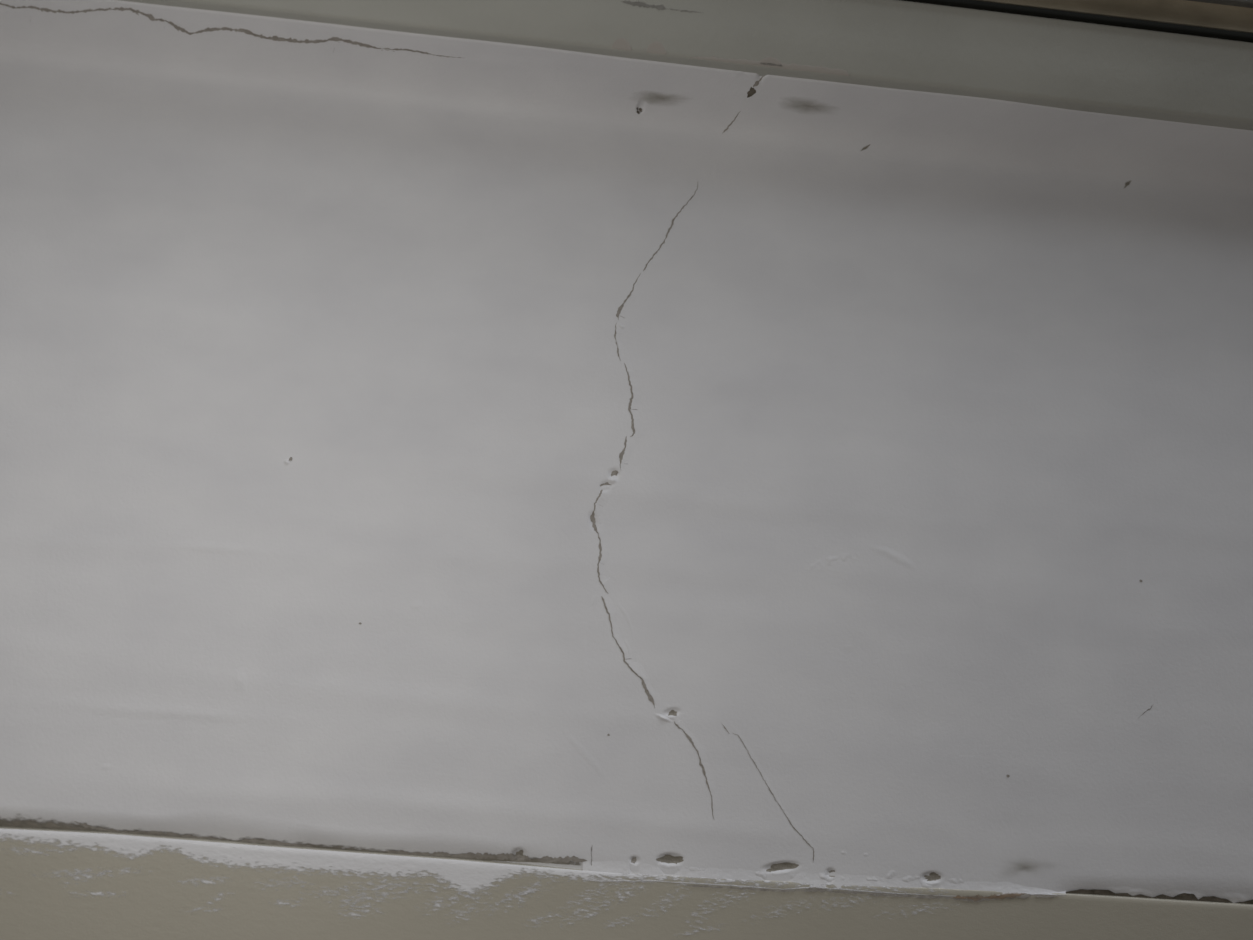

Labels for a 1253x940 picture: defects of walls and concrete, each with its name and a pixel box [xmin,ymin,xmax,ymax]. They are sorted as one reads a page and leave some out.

crack [590,181,1061,902]
hole [656,854,684,869]
hole [766,862,799,876]
spalling [923,872,941,886]